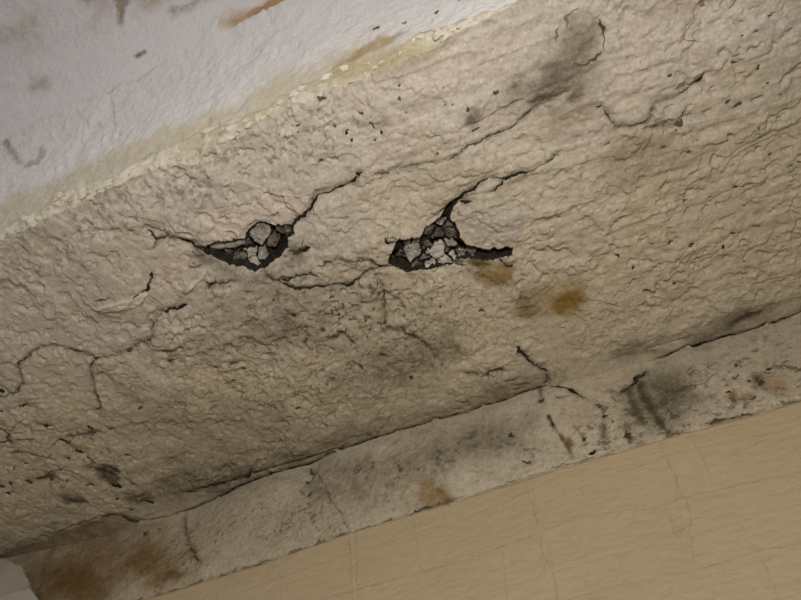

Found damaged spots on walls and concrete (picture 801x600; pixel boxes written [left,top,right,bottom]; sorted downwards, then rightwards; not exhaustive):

rust [228,0,283,25]
spalling [0,3,514,240]
crack [291,88,569,255]
crack [603,72,705,139]
spalling [388,195,514,272]
crack [0,419,137,488]
crack [0,304,187,410]
spalling [58,221,295,355]
crack [261,257,438,358]
crack [61,311,801,564]
rust [518,282,582,318]
damp [603,381,679,434]